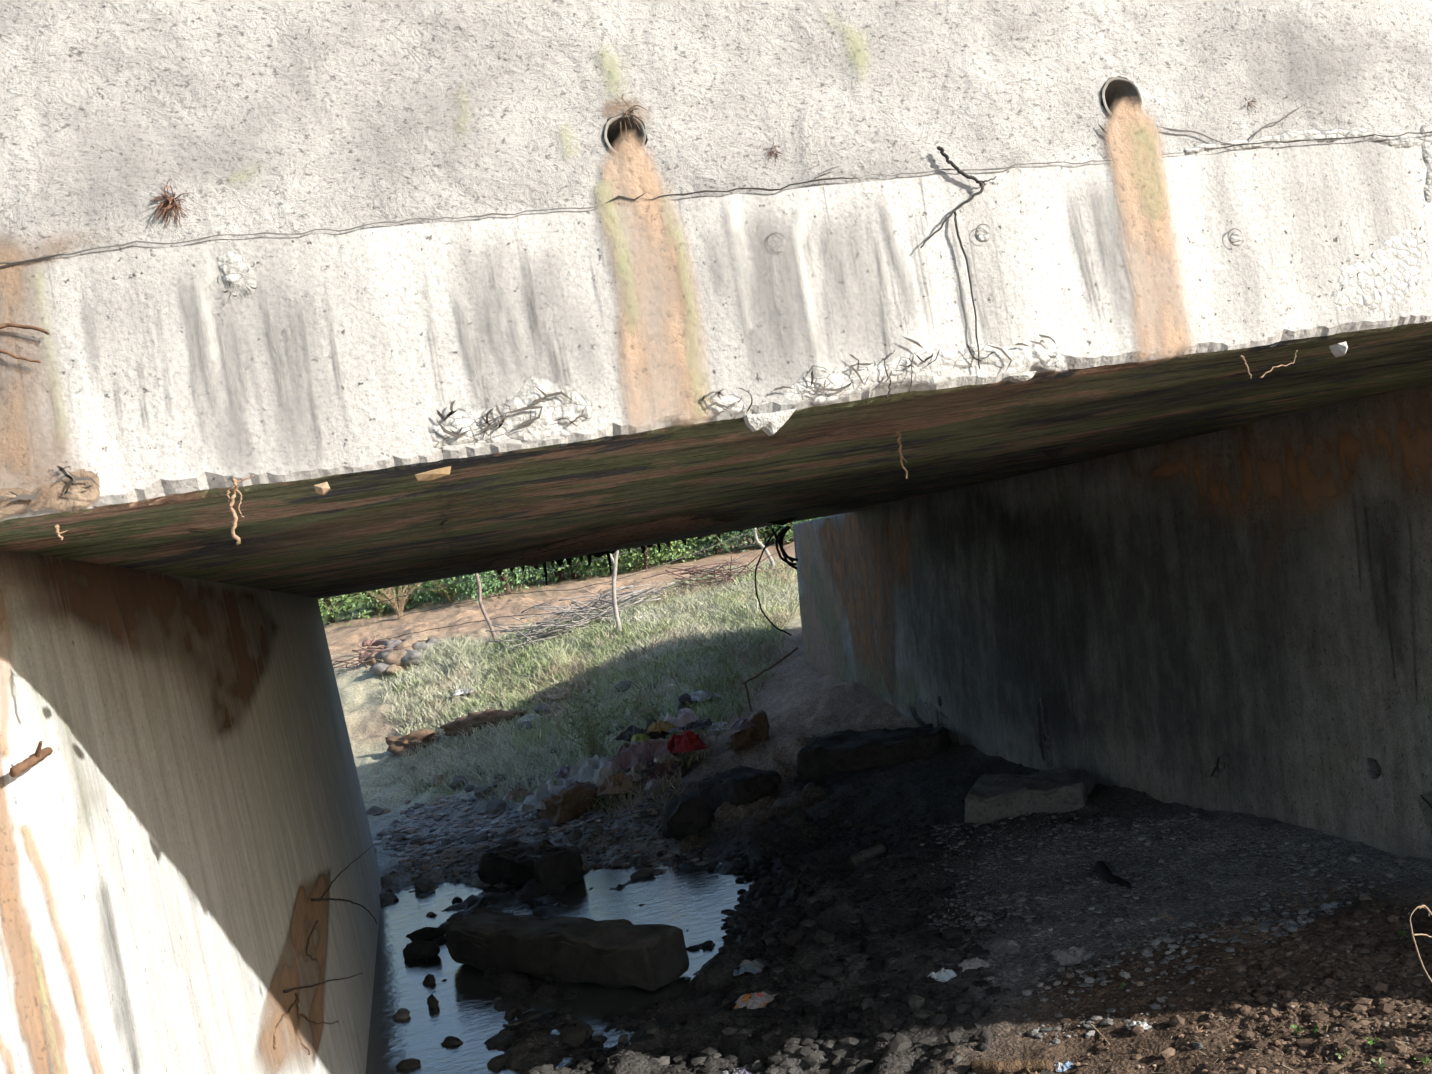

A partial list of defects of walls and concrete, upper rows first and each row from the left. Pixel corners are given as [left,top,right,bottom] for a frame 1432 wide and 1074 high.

crack [1161,127,1241,155]
crack [0,124,1112,269]
spalling [428,375,592,448]
spalling [679,334,1065,436]
peeling [415,466,451,482]
rust [35,556,277,733]
rust [259,872,330,1074]